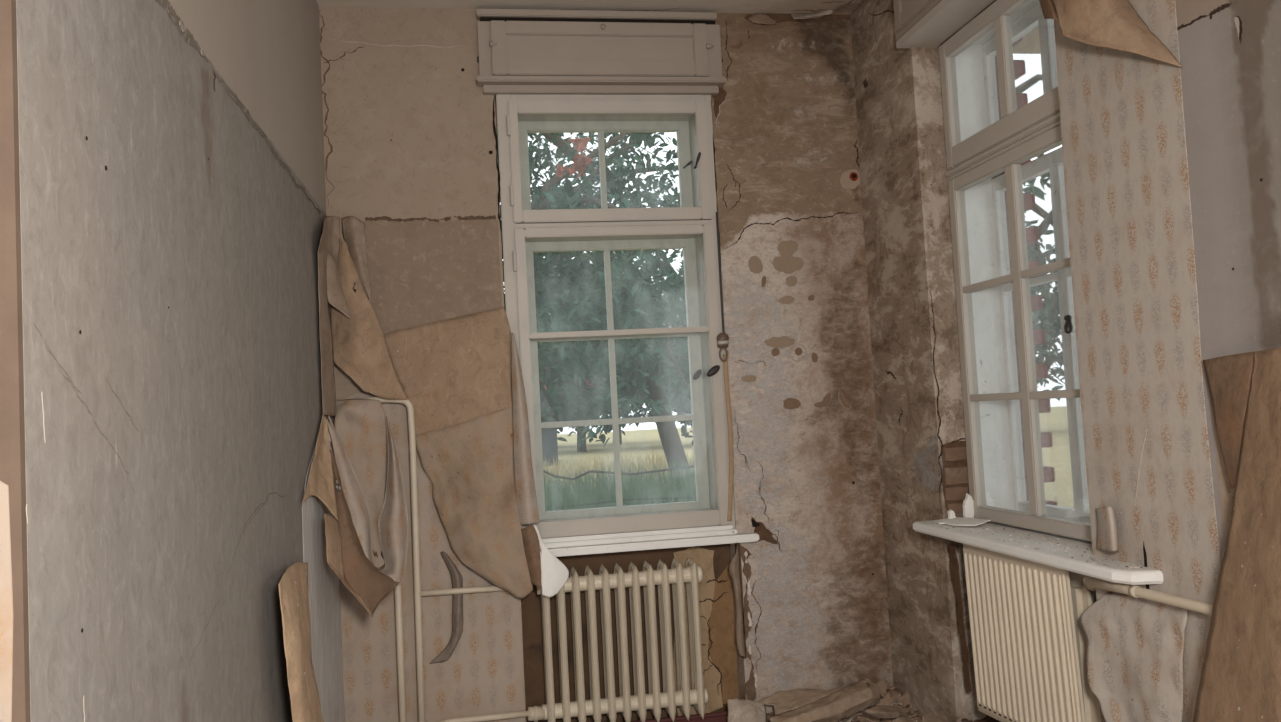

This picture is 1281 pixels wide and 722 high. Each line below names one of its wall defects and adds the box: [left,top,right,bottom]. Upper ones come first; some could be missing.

crack [1177,1,1243,43]
crack [319,9,473,204]
peeling [764,336,795,356]
peeling [748,240,815,305]
peeling [783,392,832,410]
flaking render [930,292,991,526]
peeling [673,516,779,716]
spalling [947,544,972,692]